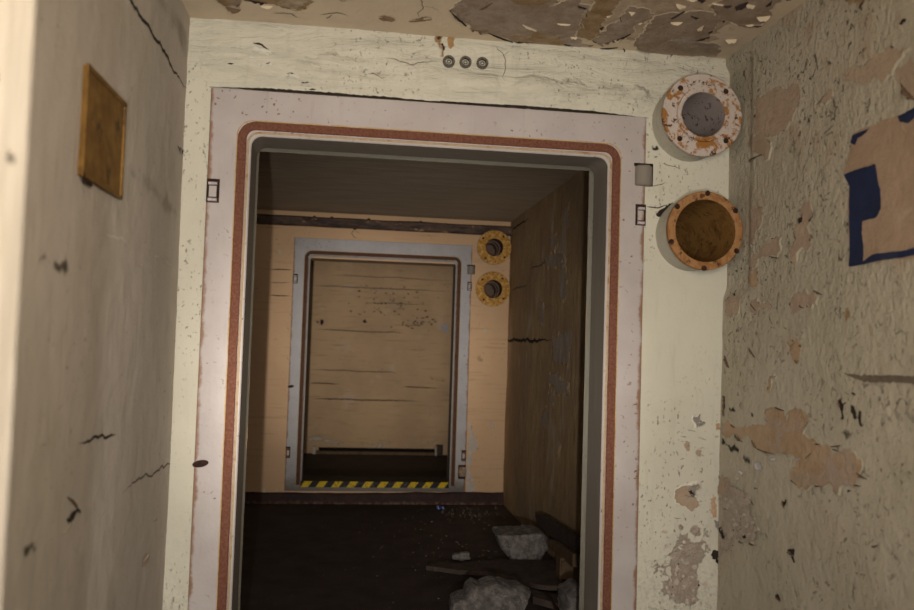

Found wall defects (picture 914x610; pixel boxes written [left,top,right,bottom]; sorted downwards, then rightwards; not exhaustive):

crack [130,0,186,87]
peeling [217,0,315,14]
peeling [447,0,788,58]
rust [216,120,622,610]
crack [508,336,552,344]
crack [845,373,914,385]
peeling [691,392,867,496]
crack [124,463,170,492]
flaking render [651,475,760,610]